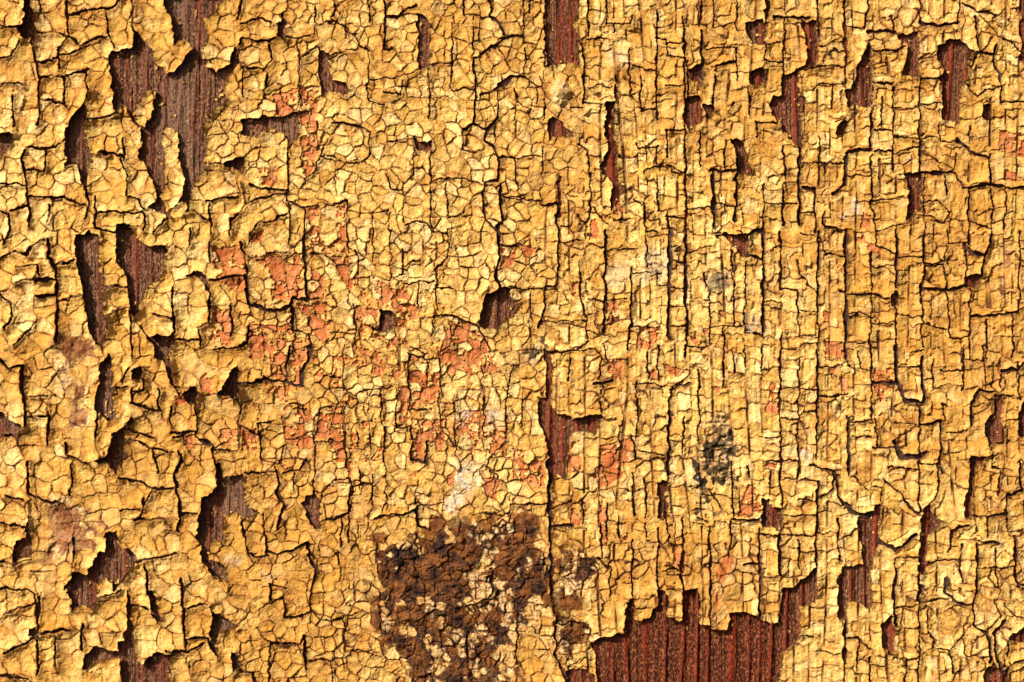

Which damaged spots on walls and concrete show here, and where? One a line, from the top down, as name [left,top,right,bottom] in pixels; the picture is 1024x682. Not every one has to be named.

peeling [0,0,358,682]
crack [206,142,313,387]
peeling [355,274,419,342]
crack [463,1,539,287]
peeling [398,244,633,546]
peeling [529,0,588,69]
crack [666,229,689,337]
crack [710,159,766,336]
crack [796,114,1024,675]
peeling [826,17,1024,158]
crack [265,459,347,669]
peeling [551,377,1024,682]